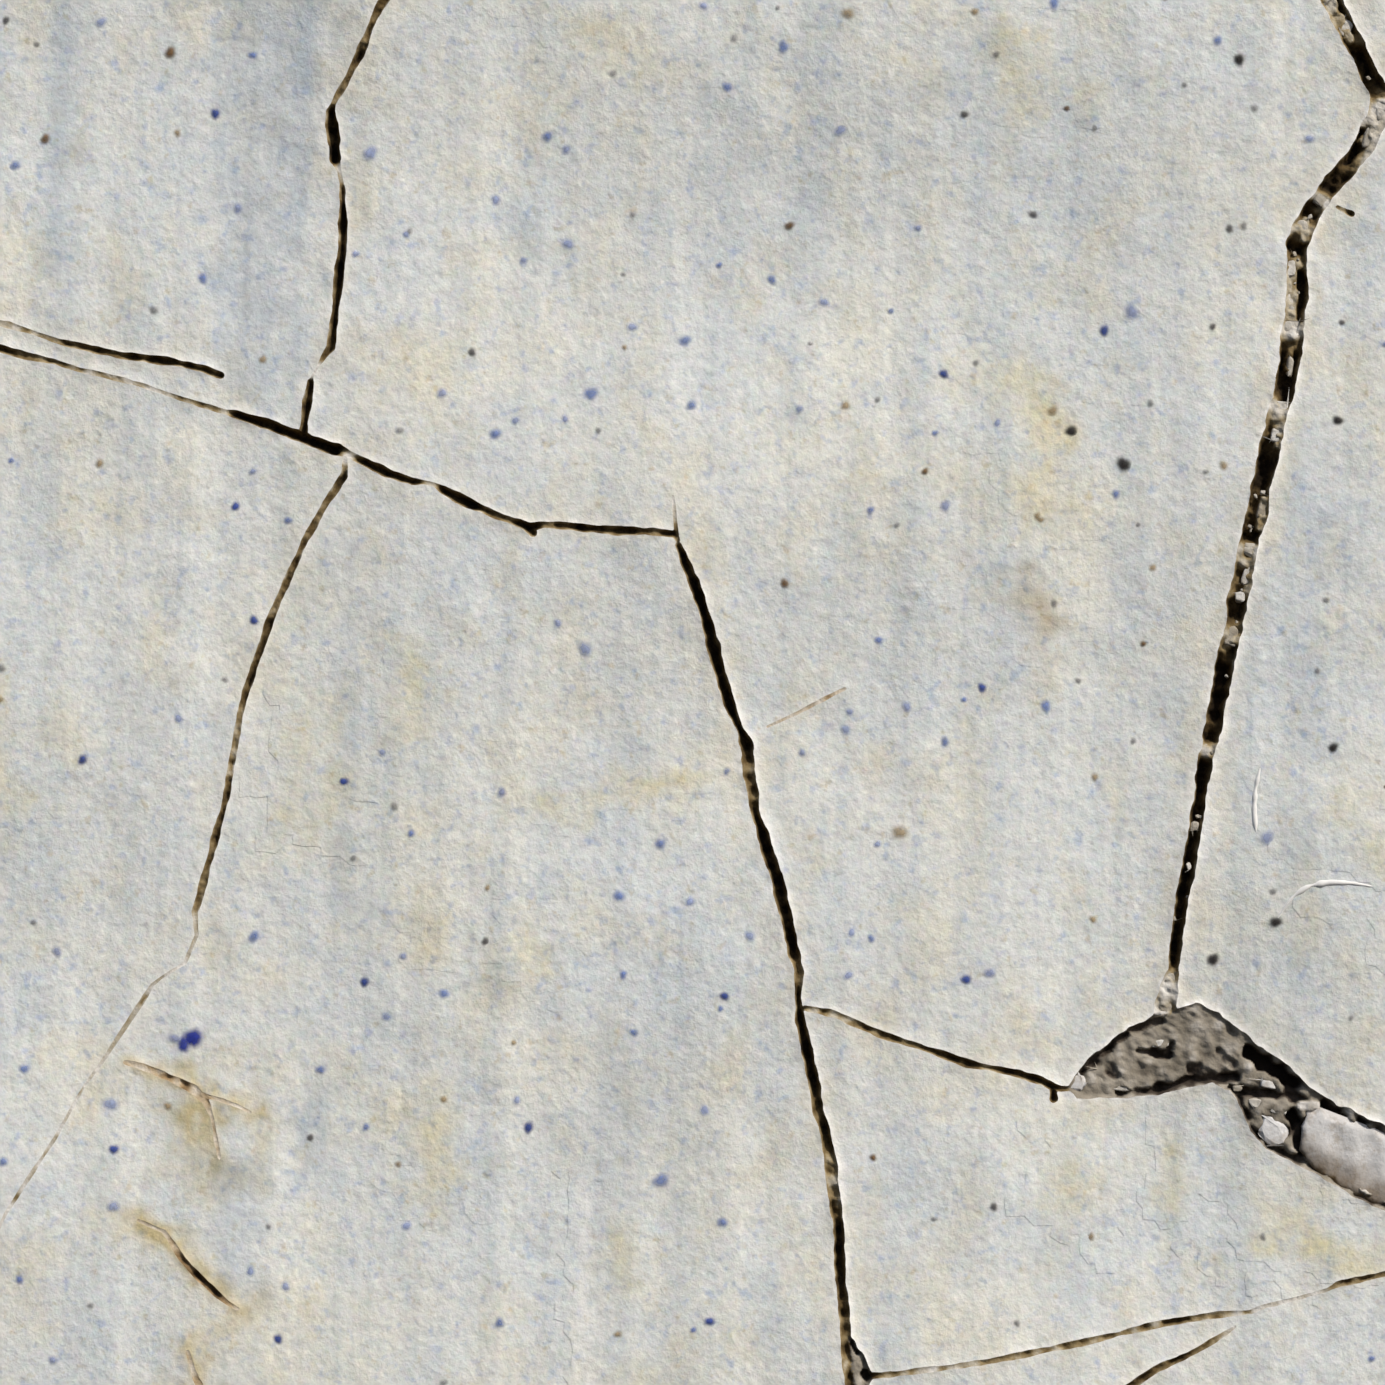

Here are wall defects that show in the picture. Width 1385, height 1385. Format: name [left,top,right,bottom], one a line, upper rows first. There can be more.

crack [137,1219,239,1311]
crack [186,1350,203,1385]
crack [0,0,680,1228]
crack [675,542,1385,1385]
spalling [1067,1003,1385,1211]
crack [1154,0,1385,1018]